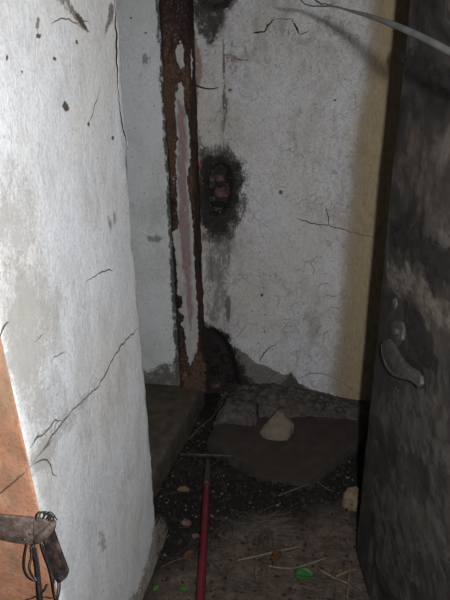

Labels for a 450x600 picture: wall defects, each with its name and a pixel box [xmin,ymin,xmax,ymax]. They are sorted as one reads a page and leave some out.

crack [114,0,128,149]
corrosion [163,65,176,197]
crack [253,18,310,35]
crack [293,209,376,238]
crack [0,328,138,494]